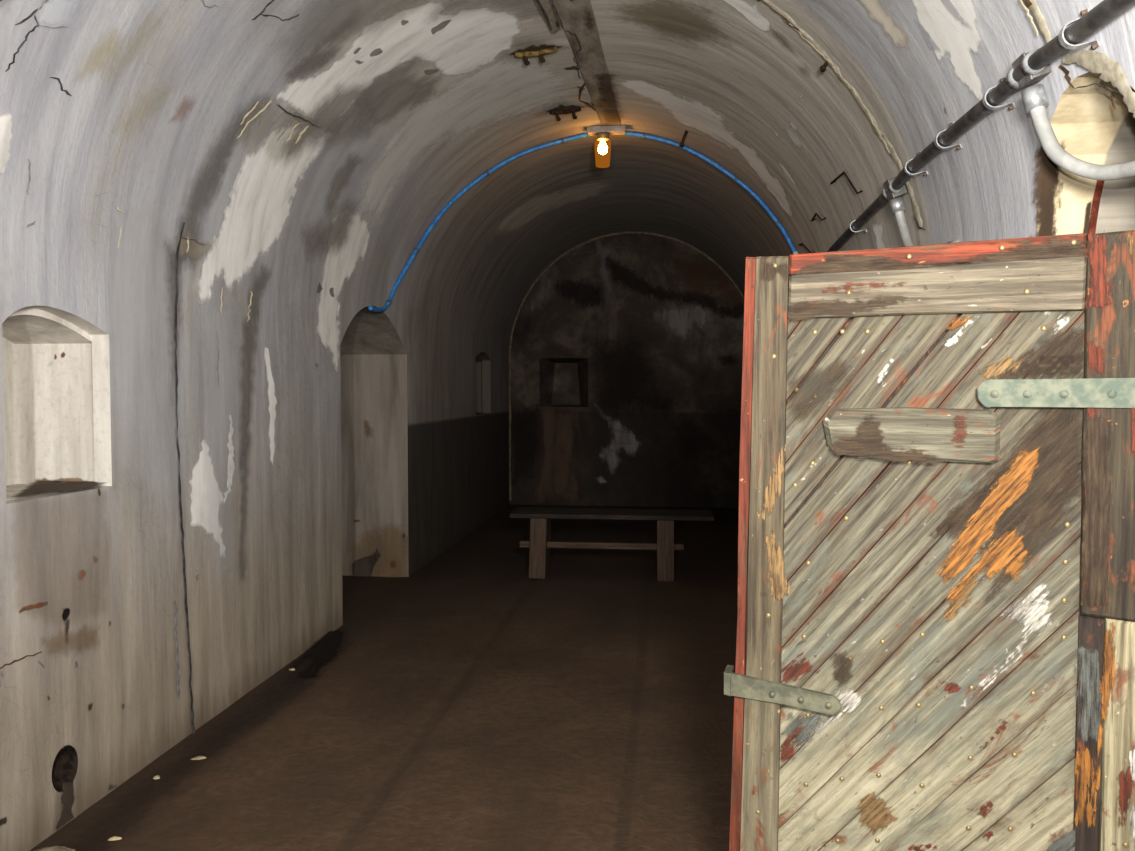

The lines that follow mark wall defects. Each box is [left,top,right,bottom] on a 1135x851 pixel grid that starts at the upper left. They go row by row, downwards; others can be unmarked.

crack [5,0,66,72]
crack [252,0,299,21]
peeling [860,0,907,47]
peeling [912,0,983,101]
crack [50,77,72,96]
flaking render [1062,49,1135,118]
peeling [0,114,12,174]
peeling [181,2,582,371]
leakage [606,257,744,318]
peeling [189,415,235,558]
crack [0,651,45,677]